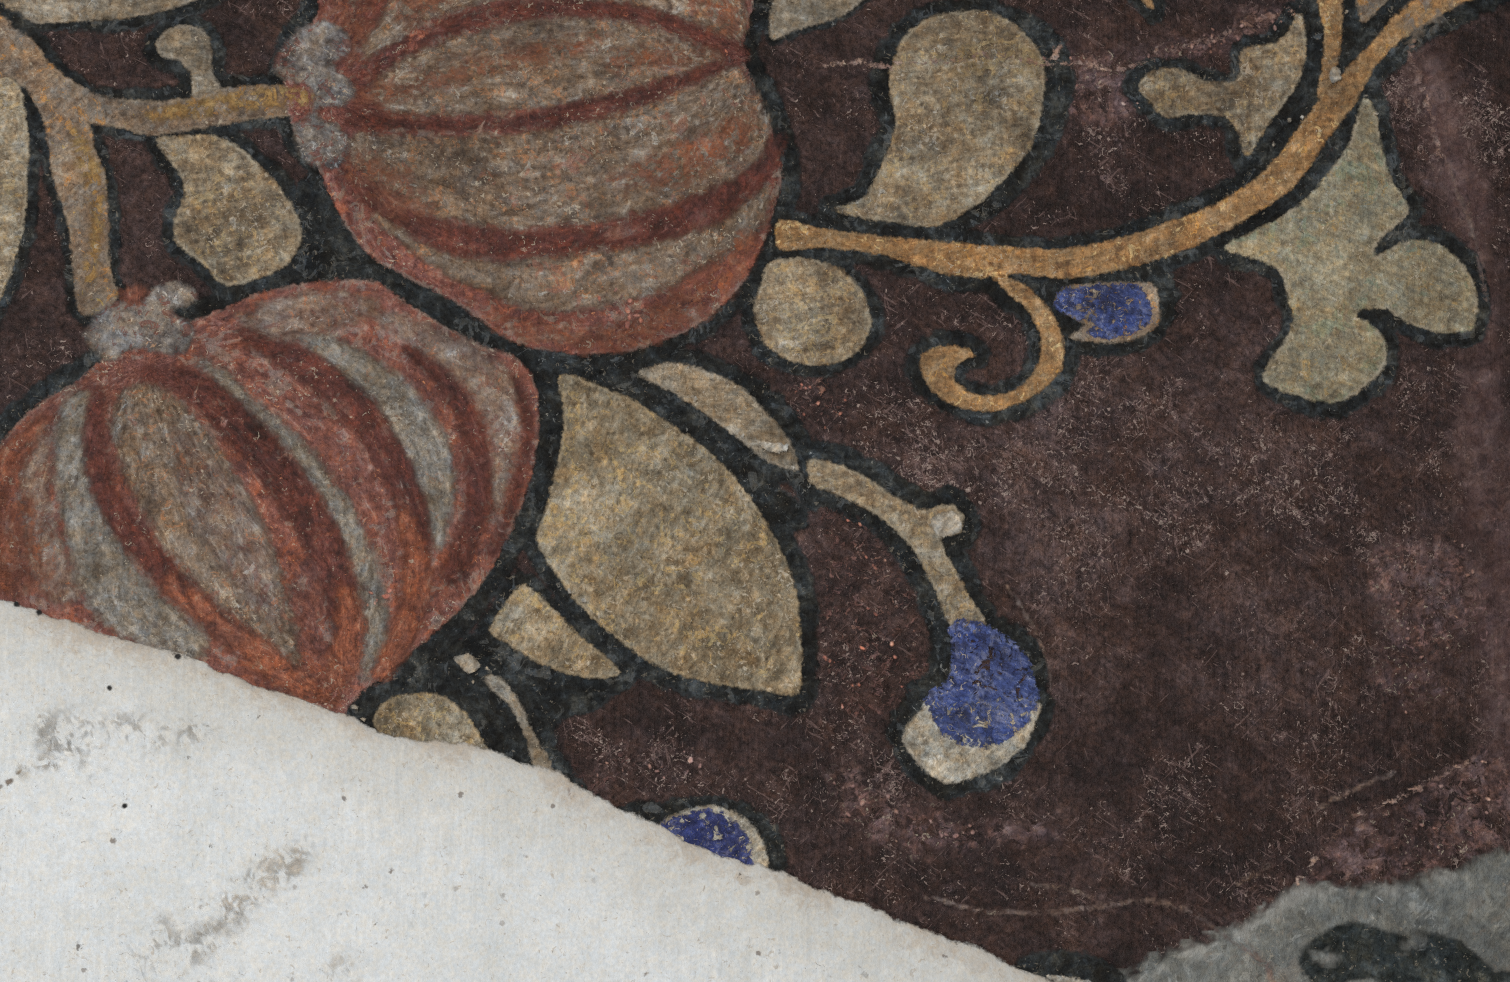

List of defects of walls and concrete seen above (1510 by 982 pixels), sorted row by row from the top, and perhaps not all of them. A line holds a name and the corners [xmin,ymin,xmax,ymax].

peeling [454,653,489,683]
peeling [820,512,925,724]
peeling [826,767,1061,857]
peeling [1295,731,1510,886]